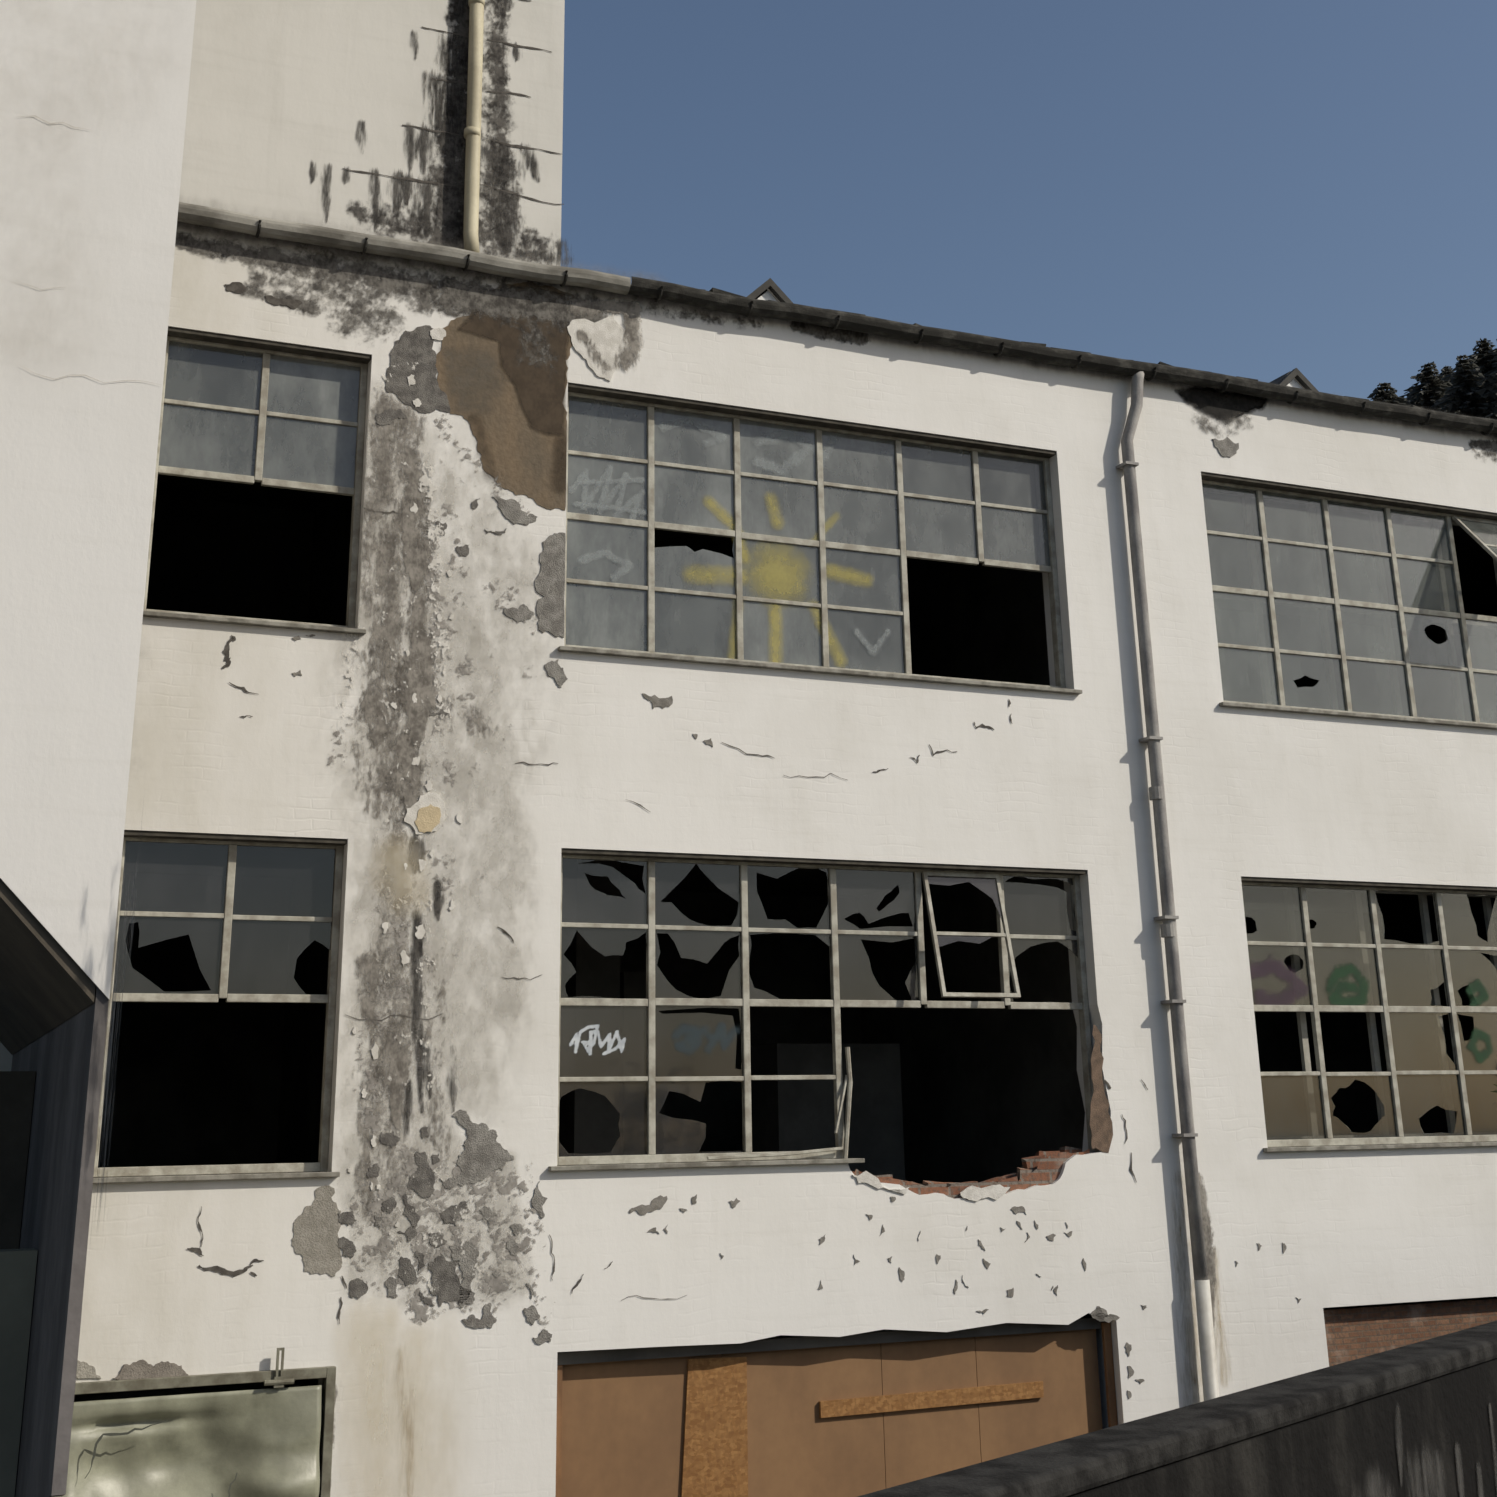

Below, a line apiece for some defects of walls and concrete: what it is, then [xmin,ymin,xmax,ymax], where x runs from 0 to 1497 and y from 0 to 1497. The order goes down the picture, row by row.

damp [310,0,572,267]
damp [175,224,761,335]
damp [791,321,868,345]
flaking render [1175,386,1268,457]
crack [722,700,1012,780]
damp [353,392,490,1225]
peeling [292,277,642,1344]
crack [497,927,541,980]
crack [347,1013,443,1021]
spalling [852,1024,1113,1243]
crack [187,1207,264,1277]
peeling [629,1194,697,1233]